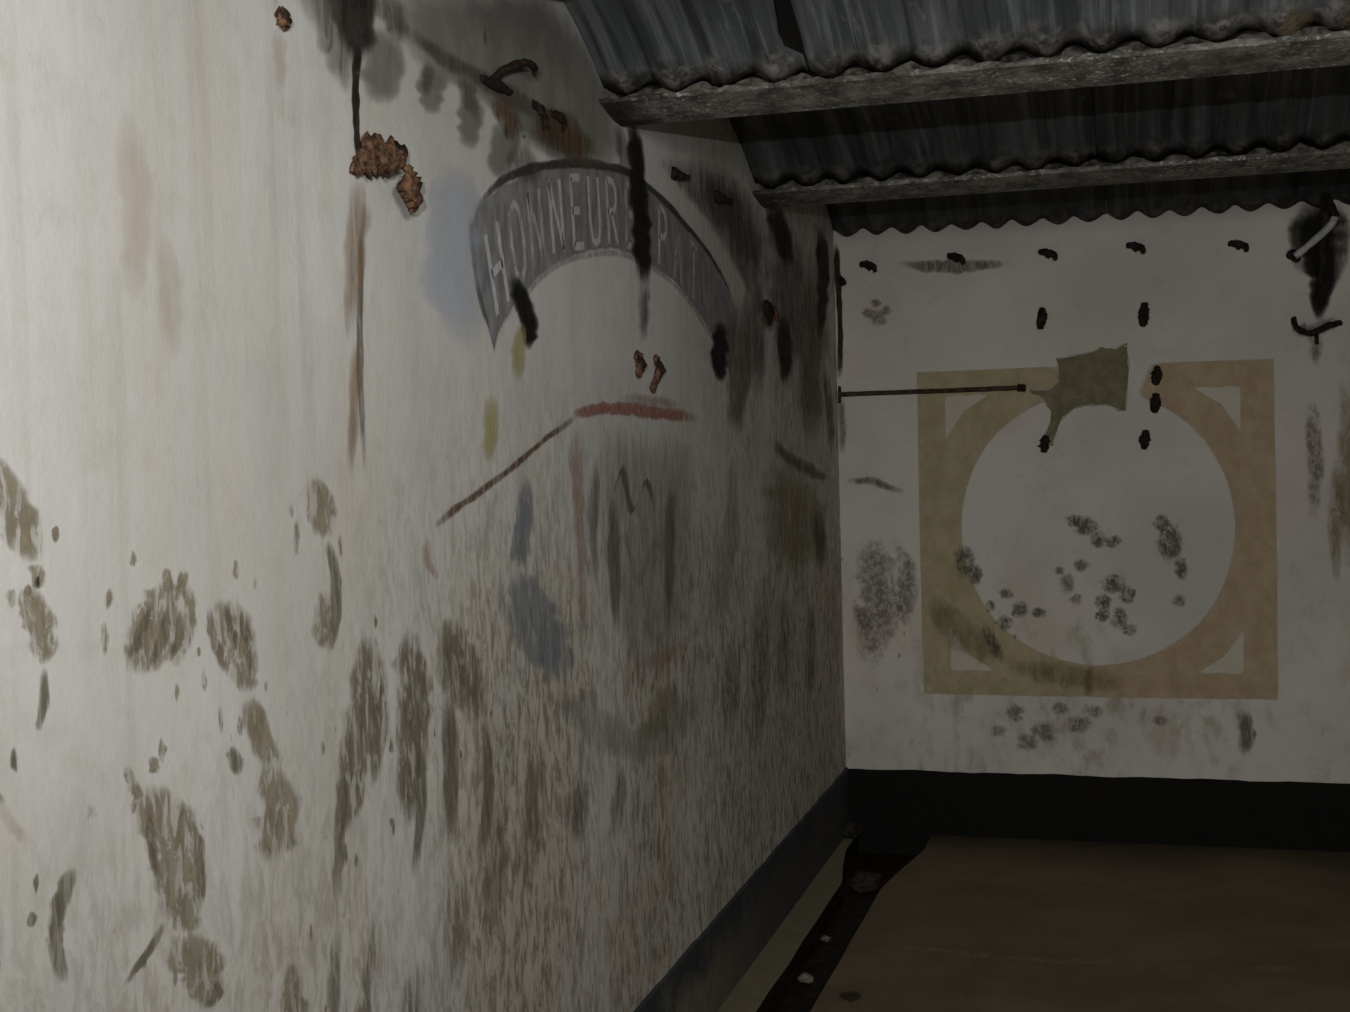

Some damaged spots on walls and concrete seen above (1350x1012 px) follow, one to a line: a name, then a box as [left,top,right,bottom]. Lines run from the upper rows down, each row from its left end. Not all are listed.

corrosion [349,161,359,178]
mould [1069,516,1118,547]
damp [1157,516,1186,577]
damp [855,554,913,651]
damp [934,591,1044,657]
mould [1056,560,1086,601]
mould [1096,576,1135,635]